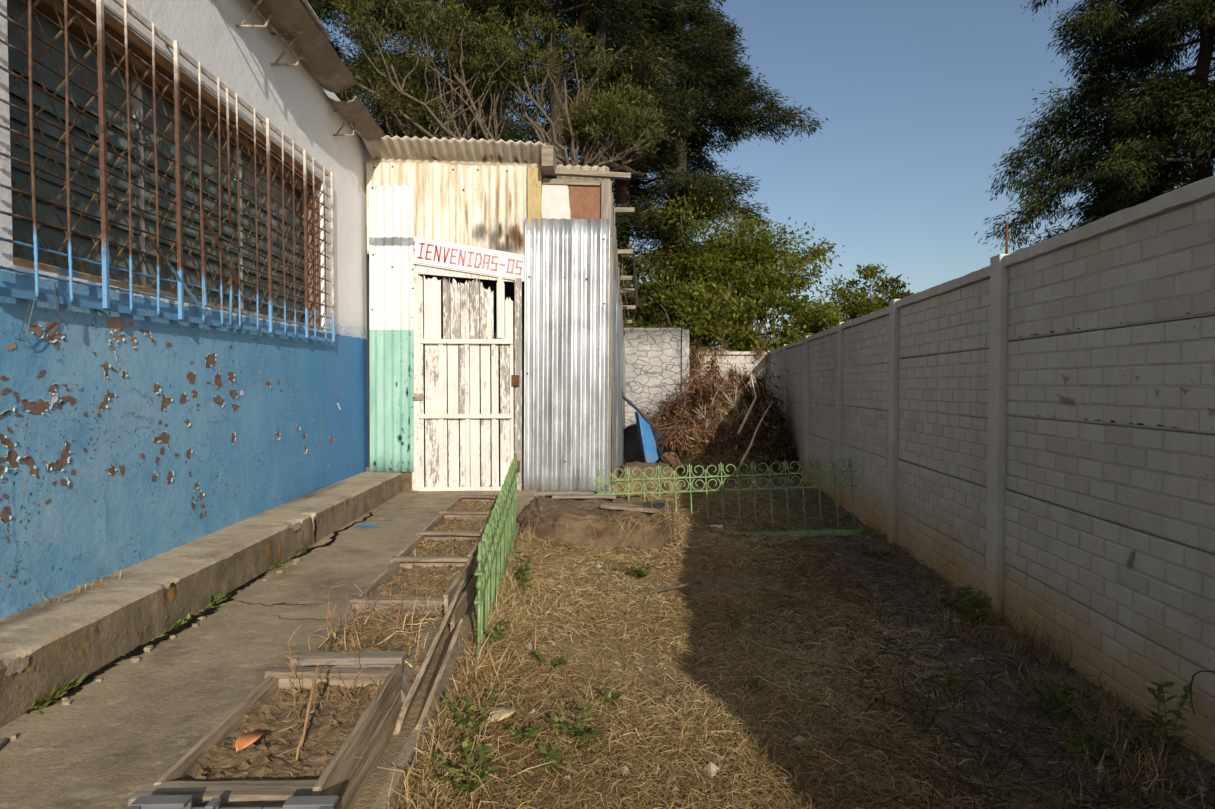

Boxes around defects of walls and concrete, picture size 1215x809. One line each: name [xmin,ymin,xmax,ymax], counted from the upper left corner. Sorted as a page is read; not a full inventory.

peeling [0,494,12,543]
peeling [0,317,172,505]
peeling [141,353,239,518]
crack [22,508,431,714]